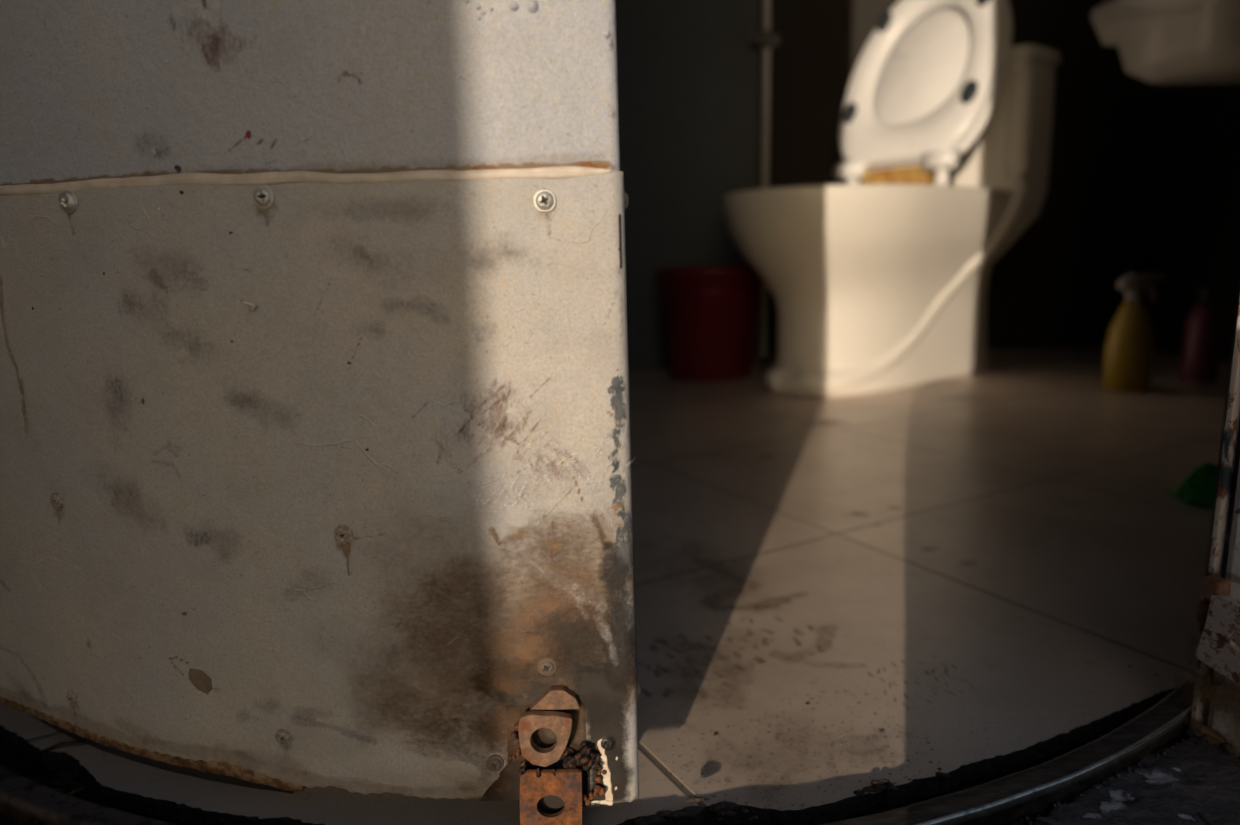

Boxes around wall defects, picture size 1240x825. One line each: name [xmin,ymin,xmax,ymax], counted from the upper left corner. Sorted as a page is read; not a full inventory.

water stain [592,517,635,688]